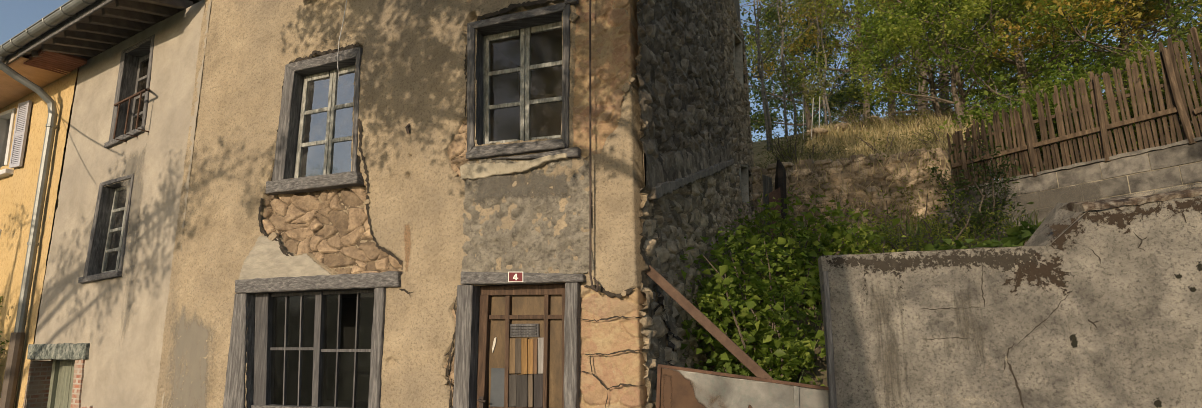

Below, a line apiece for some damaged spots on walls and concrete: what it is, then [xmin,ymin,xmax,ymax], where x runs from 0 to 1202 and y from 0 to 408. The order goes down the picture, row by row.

spalling [569,0,640,158]
spalling [262,172,403,274]
spalling [579,284,648,408]
corrosion [660,368,716,408]
crack [1004,295,1068,408]